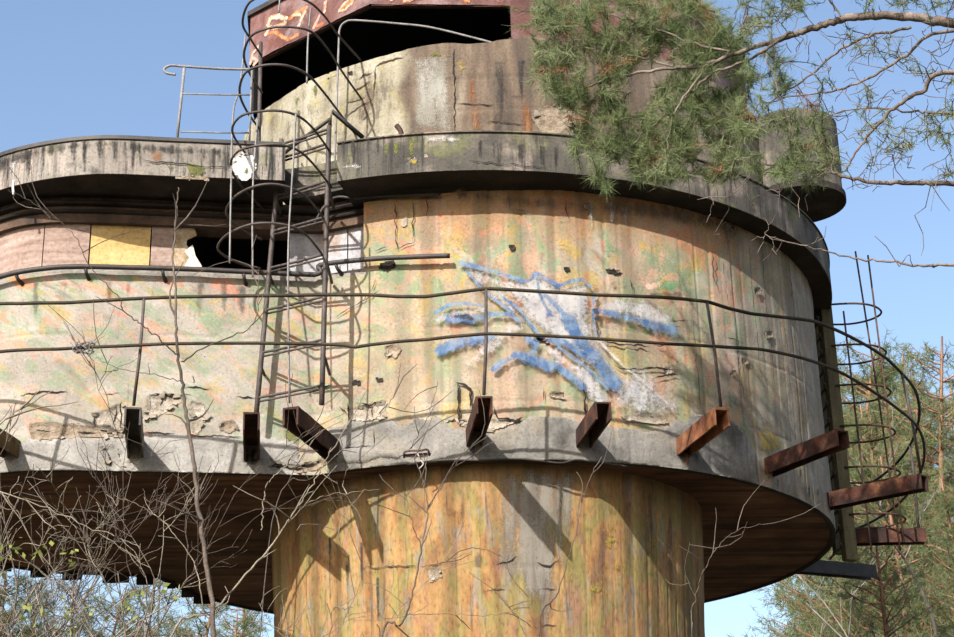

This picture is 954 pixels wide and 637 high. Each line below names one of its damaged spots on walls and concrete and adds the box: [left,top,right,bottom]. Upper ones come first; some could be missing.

crack [348,57,400,121]
leakage [416,60,454,141]
spalling [532,104,577,135]
leakage [0,140,86,174]
leakage [98,140,229,169]
spalling [29,403,131,467]
spalling [142,390,239,434]
spalling [340,399,387,421]
spalling [479,416,521,433]